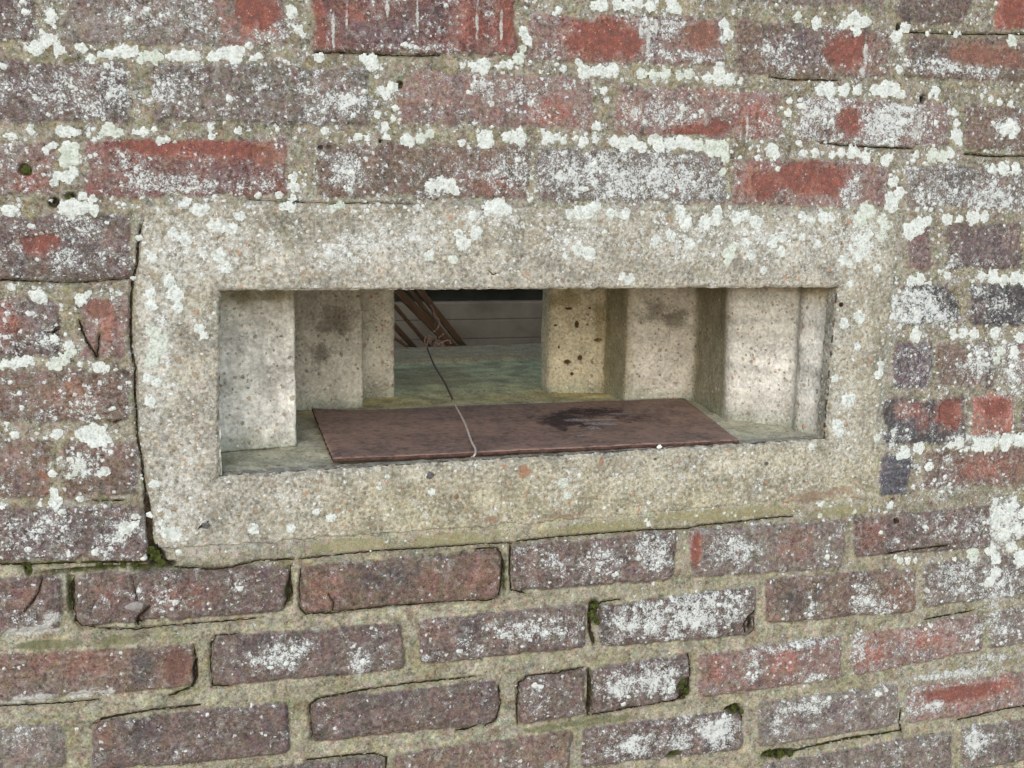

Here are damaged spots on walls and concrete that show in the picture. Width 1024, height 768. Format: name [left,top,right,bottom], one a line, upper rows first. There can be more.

crack [0,228,792,724]